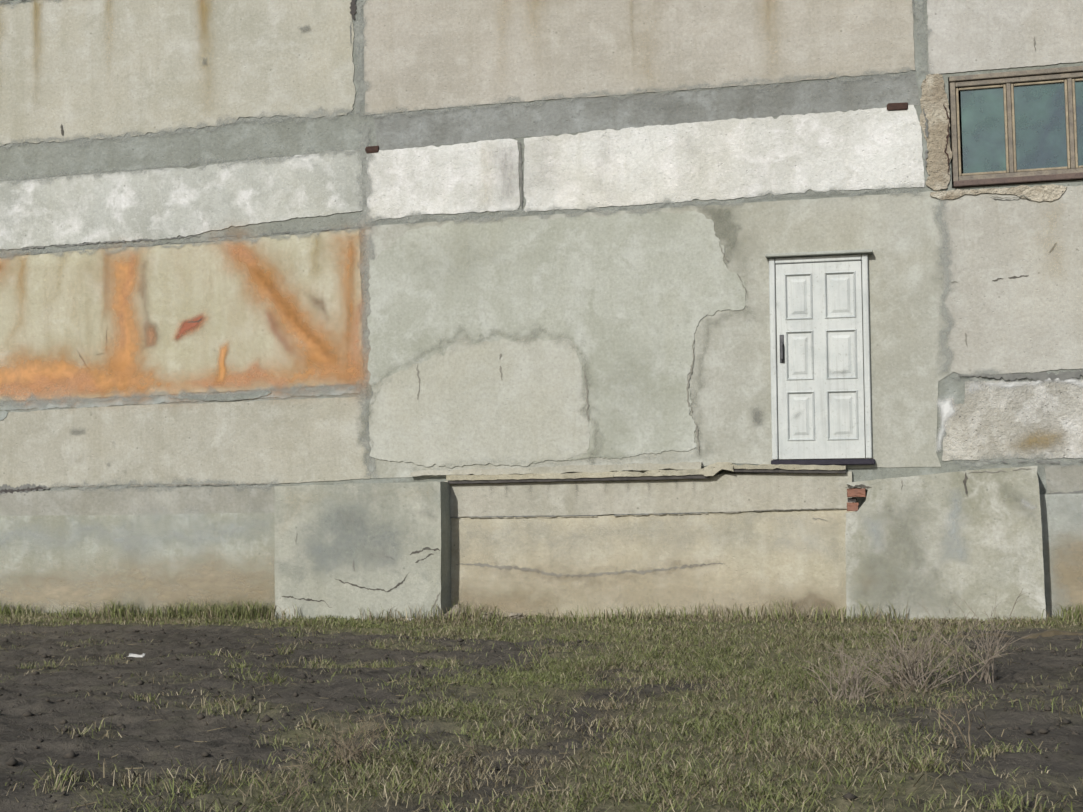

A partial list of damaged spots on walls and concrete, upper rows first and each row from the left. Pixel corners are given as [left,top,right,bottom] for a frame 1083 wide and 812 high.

spalling [920,74,1067,202]
rust [0,258,171,398]
rust [202,246,360,386]
crack [282,547,723,608]